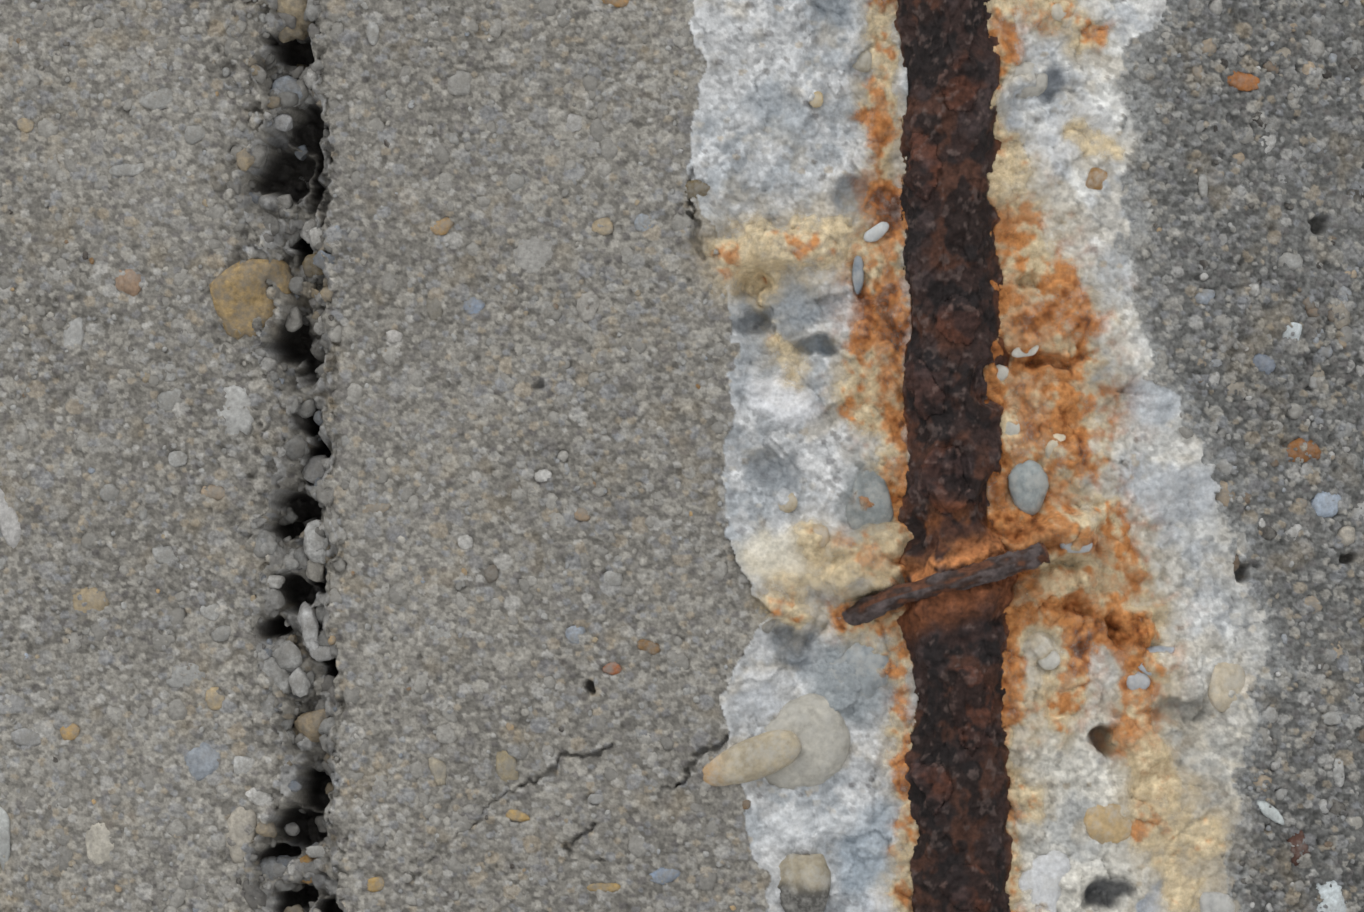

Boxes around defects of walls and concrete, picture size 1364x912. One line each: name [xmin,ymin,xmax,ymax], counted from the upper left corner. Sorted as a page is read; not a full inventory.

crack [209,0,348,912]
spalling [685,0,919,912]
spalling [987,0,1275,912]